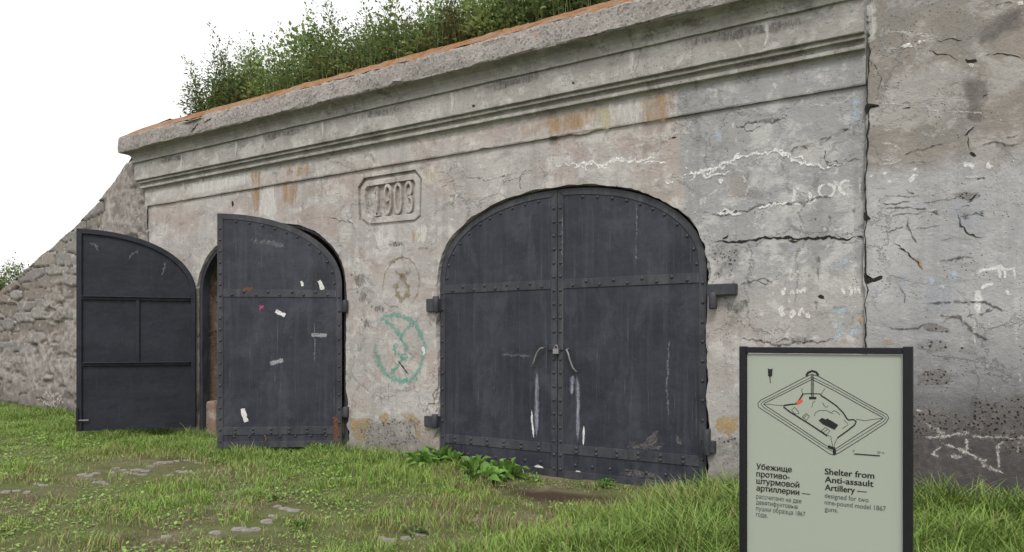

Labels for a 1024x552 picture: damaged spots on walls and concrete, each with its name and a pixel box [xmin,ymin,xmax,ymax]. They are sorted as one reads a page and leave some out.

crack [556,7,1017,348]